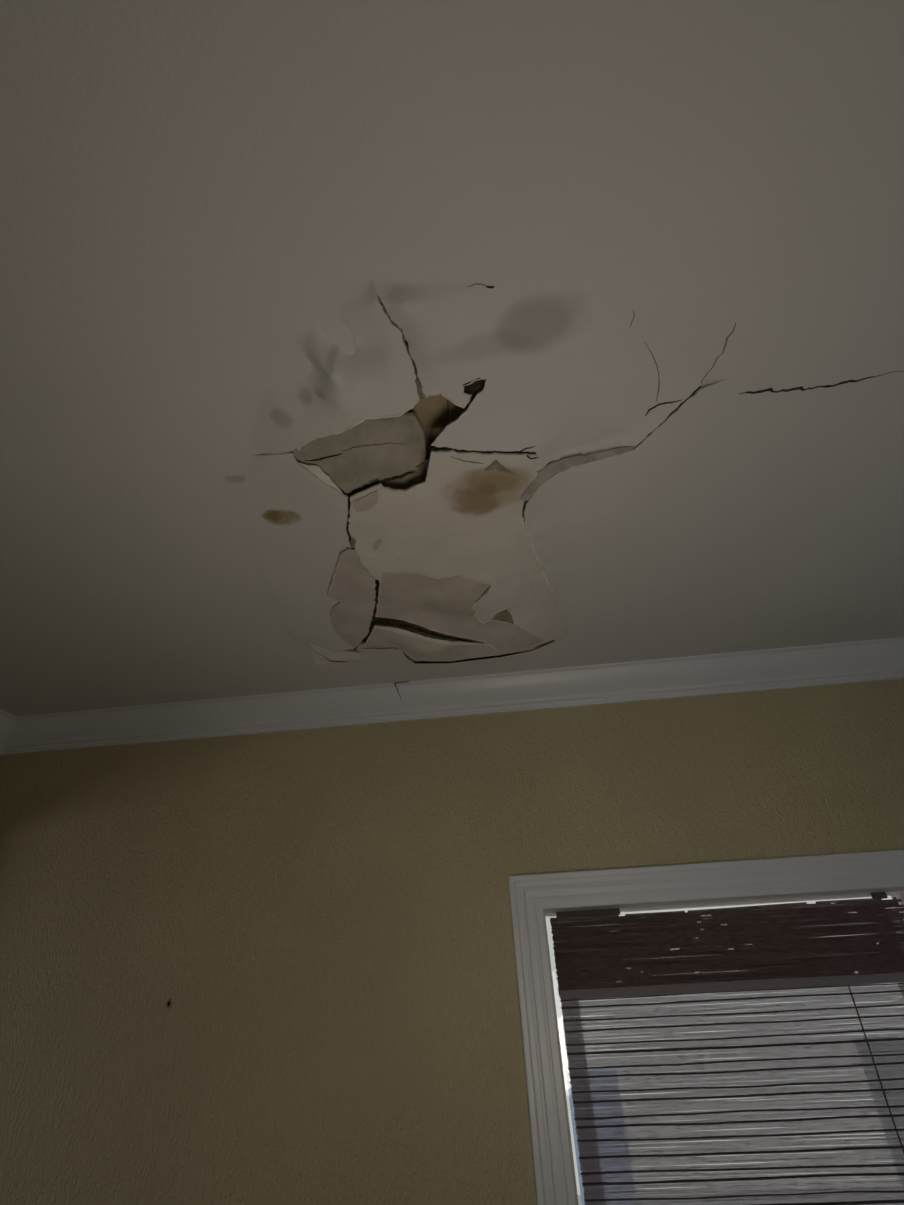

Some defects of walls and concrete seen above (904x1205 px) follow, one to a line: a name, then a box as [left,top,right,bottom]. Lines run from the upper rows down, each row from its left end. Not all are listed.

crack [383,306,423,399]
crack [630,310,736,449]
crack [739,371,903,394]
spalling [290,336,523,549]
crack [429,446,556,474]
damp [267,512,292,523]
spalling [373,579,484,643]
spalling [492,610,514,624]